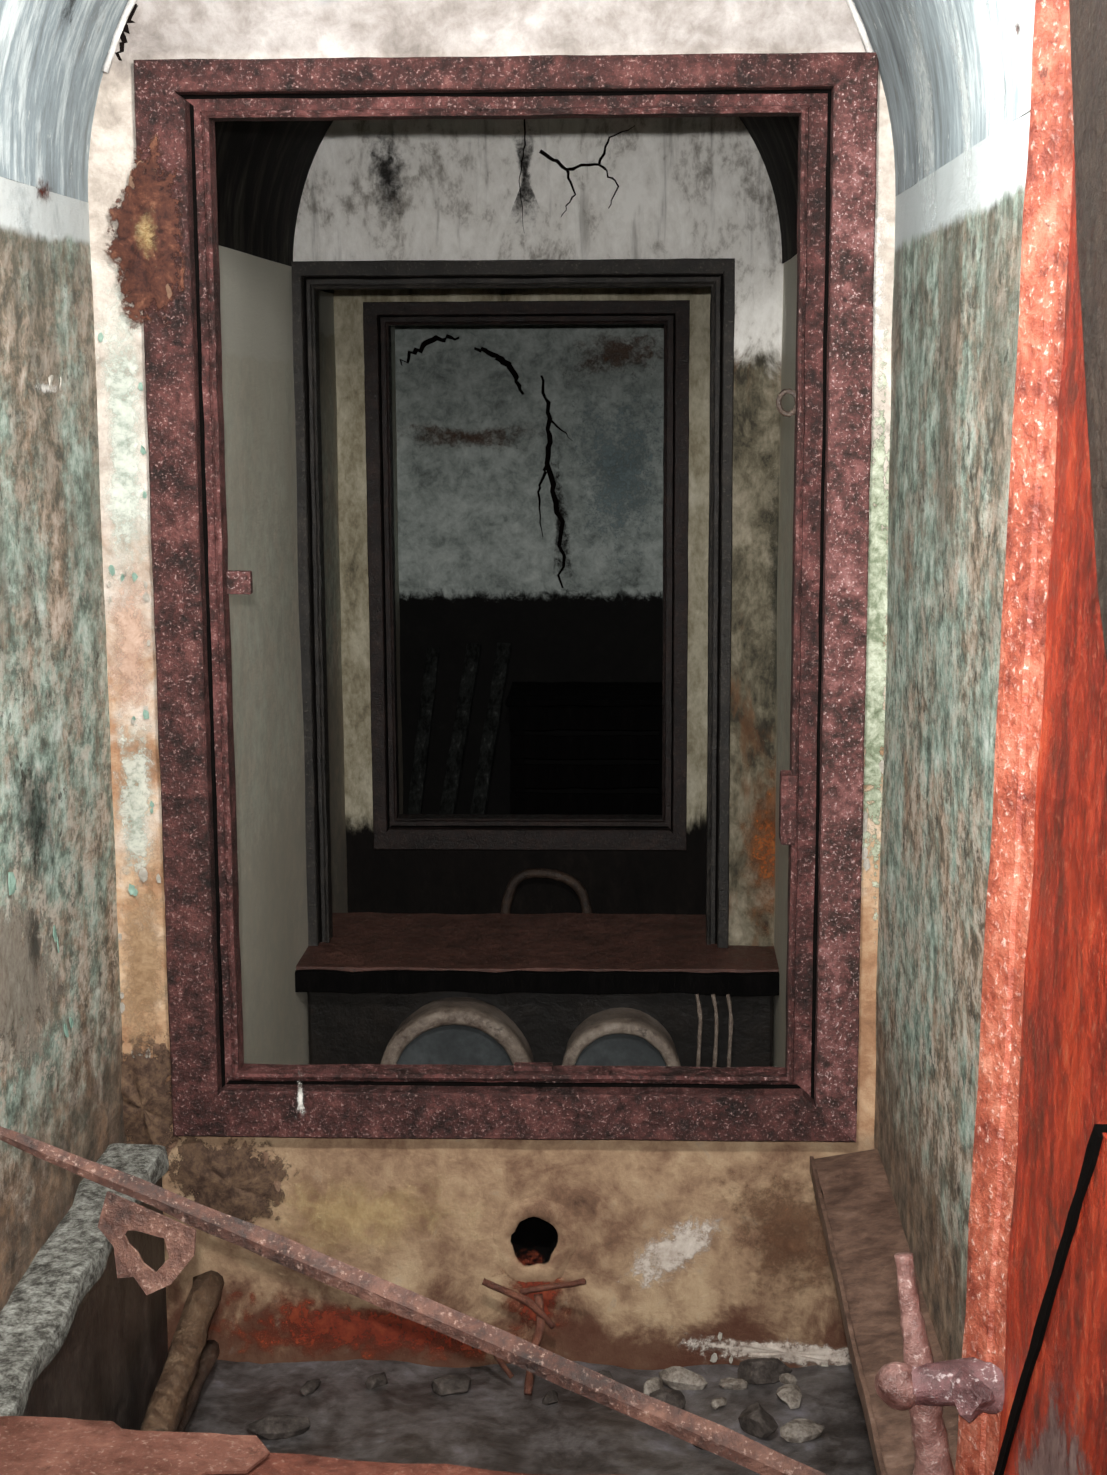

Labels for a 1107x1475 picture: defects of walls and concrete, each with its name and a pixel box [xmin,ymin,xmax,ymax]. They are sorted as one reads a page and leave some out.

crack [519,119,634,229]
crack [399,334,573,588]
leakage [634,1219,712,1286]
rust [212,1293,485,1360]
rust [502,1254,570,1329]